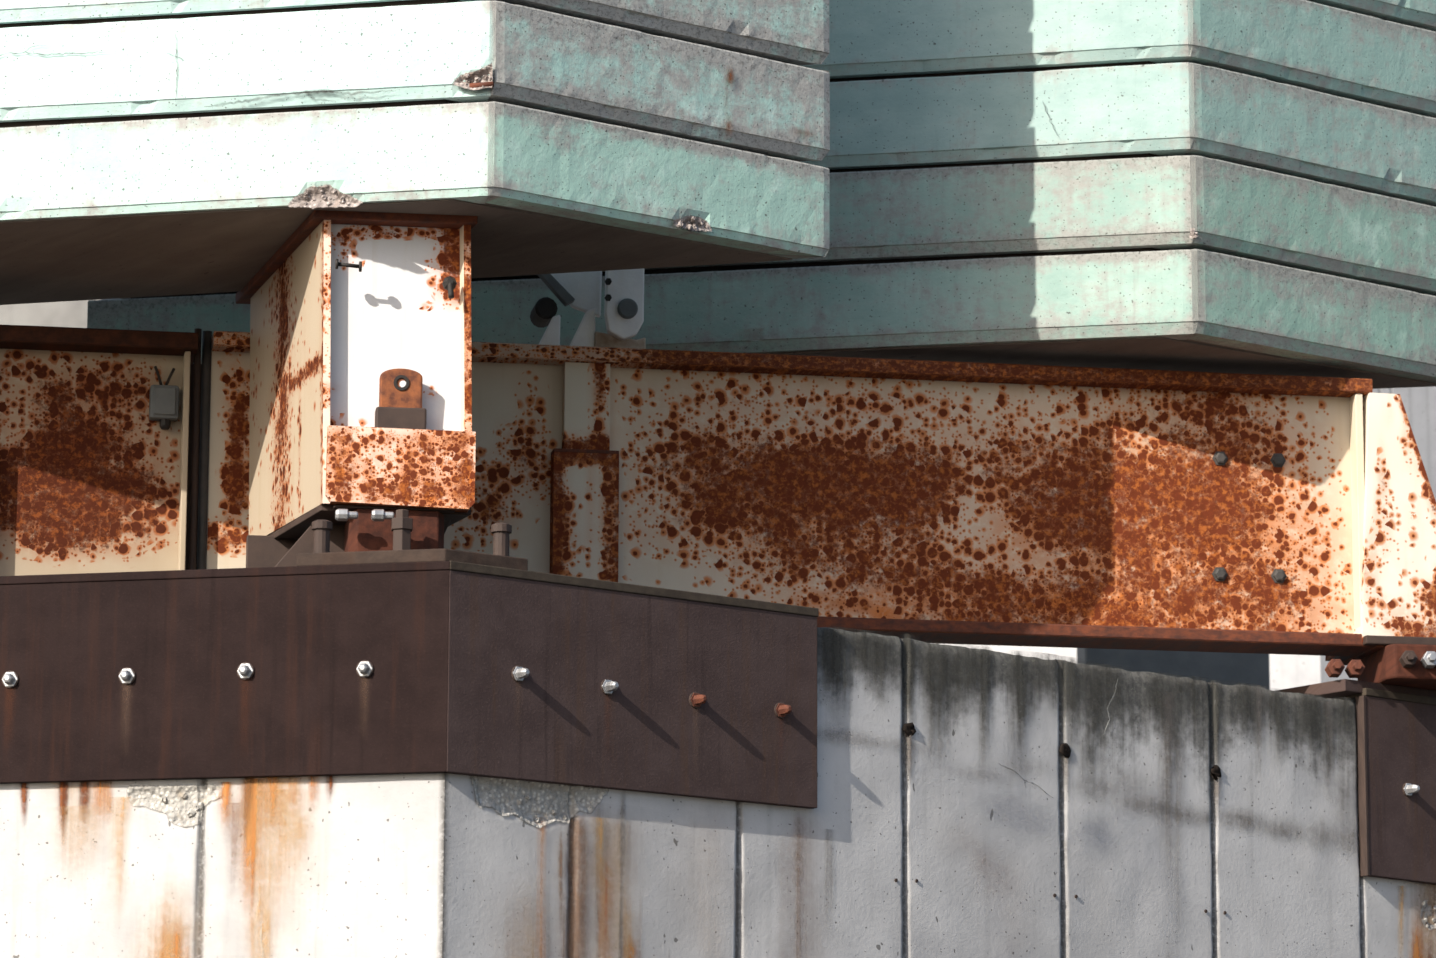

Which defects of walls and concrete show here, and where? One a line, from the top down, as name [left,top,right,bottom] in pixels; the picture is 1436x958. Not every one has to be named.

spalling [454,63,494,90]
spalling [288,184,362,208]
damp [823,628,989,729]
damp [1014,652,1121,761]
damp [1151,673,1282,809]
spalling [126,784,224,827]
spalling [471,776,609,828]
corrosion [222,776,332,951]
corrosion [1400,886,1431,958]